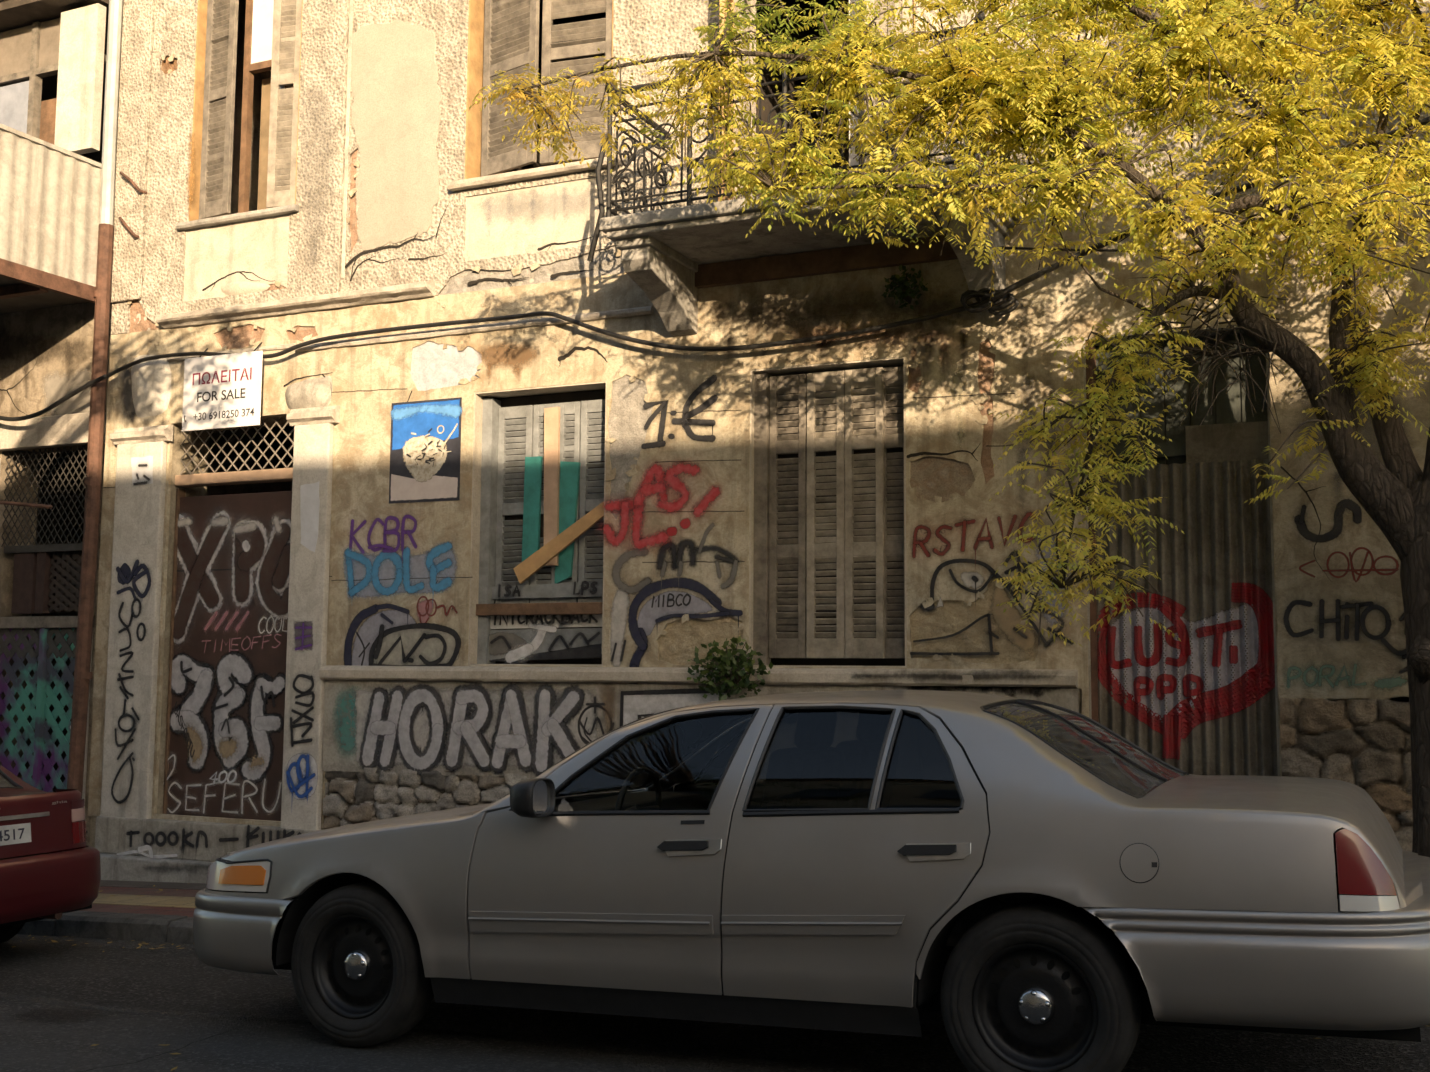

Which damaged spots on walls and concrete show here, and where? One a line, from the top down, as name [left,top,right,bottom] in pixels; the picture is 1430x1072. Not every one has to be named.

spalling [346,150,359,252]
crack [345,203,449,281]
crack [467,236,594,286]
spalling [215,324,265,350]
spalling [287,326,318,342]
peeling [605,375,653,519]
spalling [908,339,997,504]